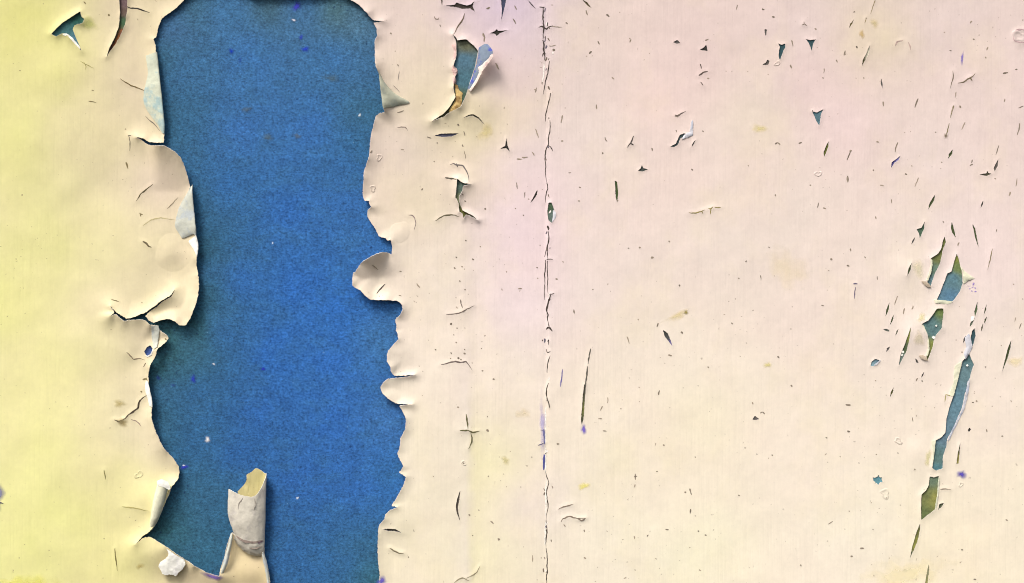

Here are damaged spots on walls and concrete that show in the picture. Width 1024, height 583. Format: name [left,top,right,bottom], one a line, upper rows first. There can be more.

peeling [52,12,84,50]
peeling [456,179,476,219]
peeling [435,0,507,125]
peeling [671,120,695,147]
peeling [111,0,413,583]
crack [538,7,591,583]
peeling [871,224,974,378]
peeling [910,304,987,557]